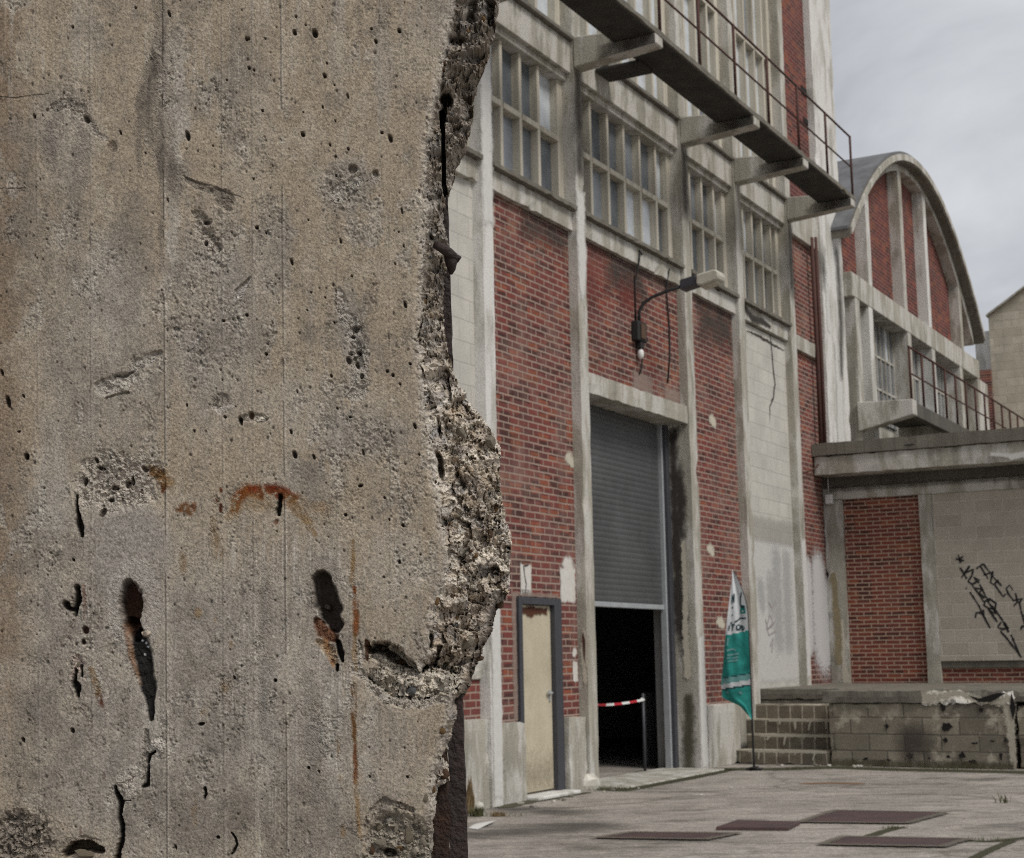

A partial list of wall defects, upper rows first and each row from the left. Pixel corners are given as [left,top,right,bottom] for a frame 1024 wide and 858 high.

spalling [315,0,512,858]
crack [747,331,784,407]
rust [208,480,334,561]
water stain [668,428,689,644]
rust [313,617,339,671]
rust [348,538,361,661]
crack [113,728,167,858]
rust [349,681,363,840]
spalling [921,690,1017,765]